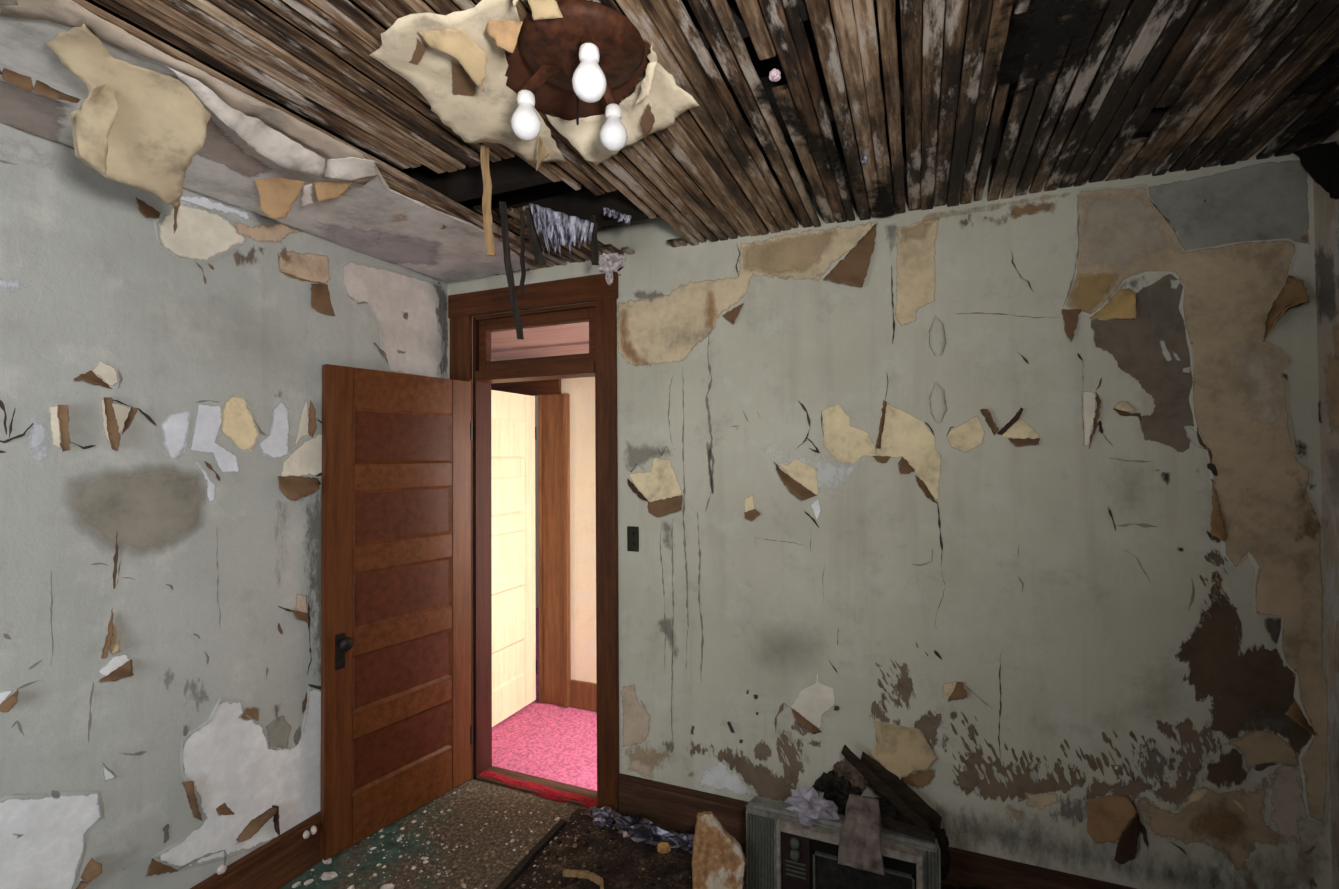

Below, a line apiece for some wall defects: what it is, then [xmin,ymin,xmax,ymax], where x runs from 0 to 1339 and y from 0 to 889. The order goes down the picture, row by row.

damp [992,0,1110,95]
spalling [1091,274,1204,452]
flaking render [191,404,239,502]
flaking render [260,402,289,458]
damp [75,471,203,550]
spalling [685,703,820,802]
spalling [871,663,975,753]
spalling [953,532,1318,823]